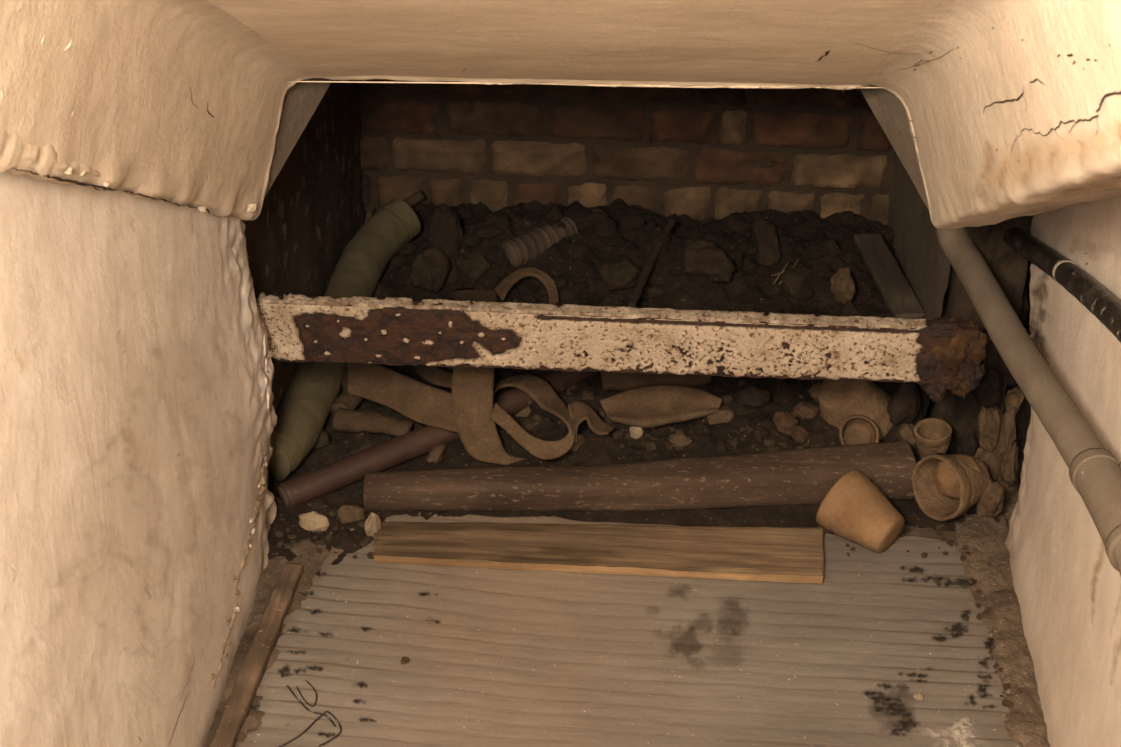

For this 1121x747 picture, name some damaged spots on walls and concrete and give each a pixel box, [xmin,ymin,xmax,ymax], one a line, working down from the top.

crack [983,79,1121,151]
rust [294,307,520,366]